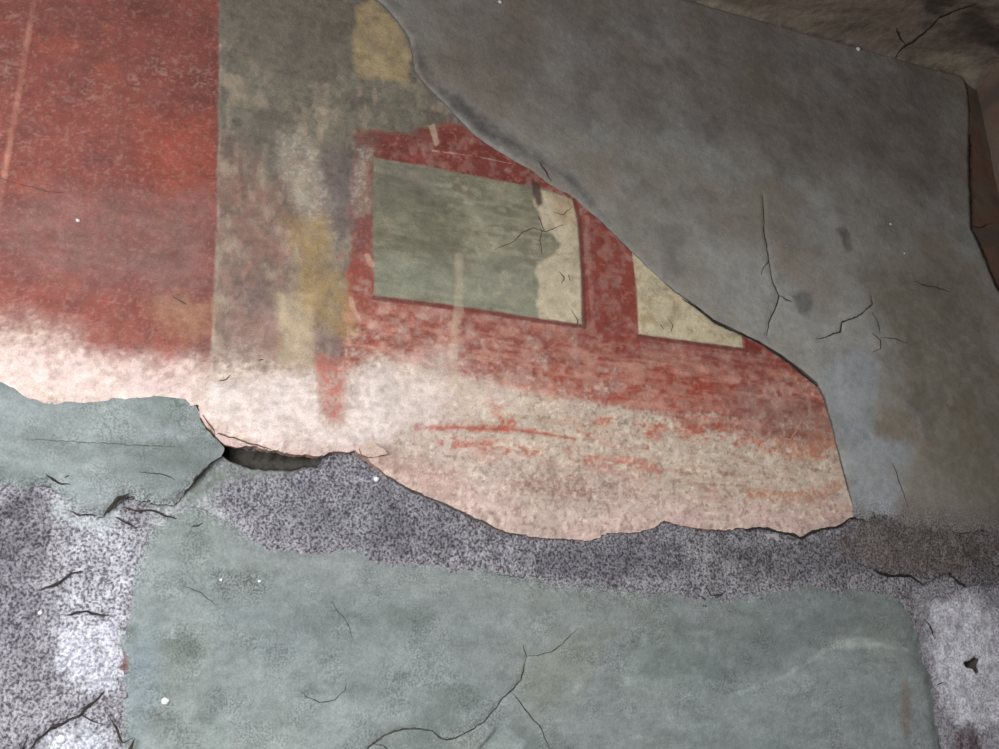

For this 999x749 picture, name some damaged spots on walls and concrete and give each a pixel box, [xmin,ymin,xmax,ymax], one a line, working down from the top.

peeling [427,123,511,164]
crack [494,209,569,253]
crack [819,298,908,351]
crack [46,475,70,485]
crack [69,494,202,529]
flaking render [0,429,999,749]
crack [367,629,577,749]
crack [22,691,135,749]